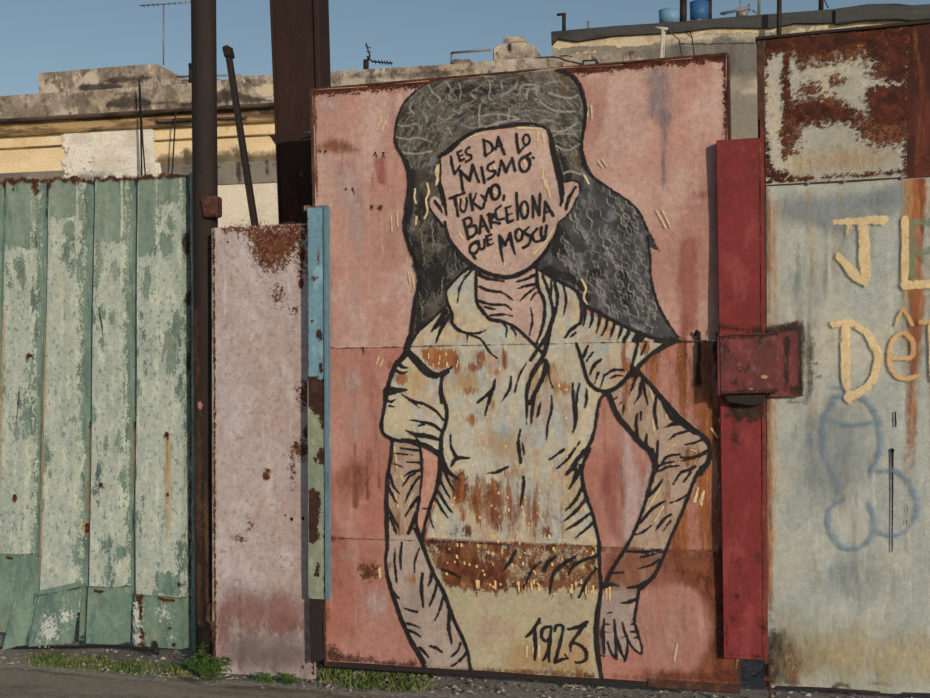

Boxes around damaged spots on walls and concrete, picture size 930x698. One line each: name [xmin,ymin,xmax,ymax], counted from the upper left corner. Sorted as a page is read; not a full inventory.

corrosion [0,172,192,205]
corrosion [132,593,148,648]
corrosion [182,77,490,662]
corrosion [423,289,821,686]
corrosion [758,27,927,456]